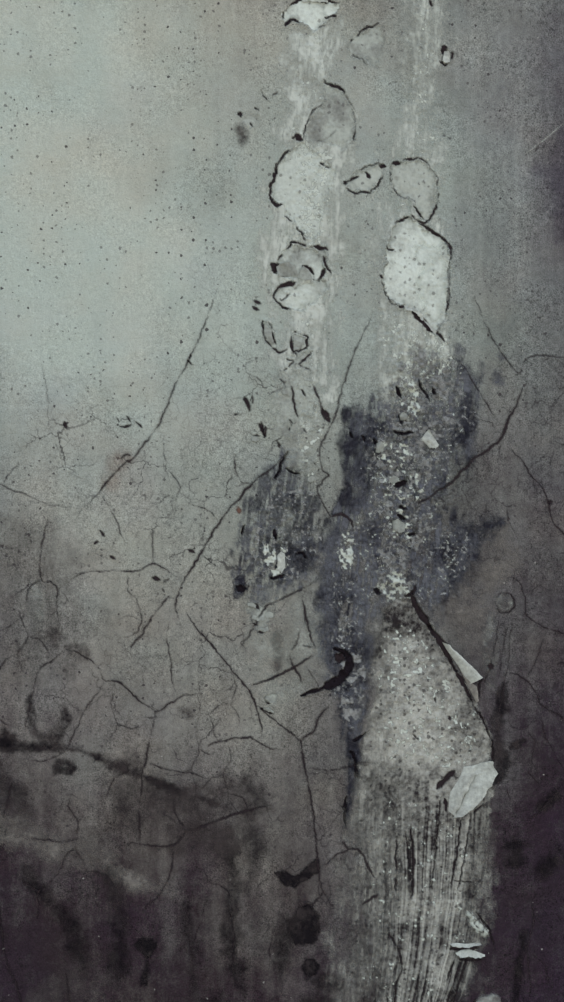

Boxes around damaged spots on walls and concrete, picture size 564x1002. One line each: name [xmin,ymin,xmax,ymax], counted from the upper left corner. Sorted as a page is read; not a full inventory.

peeling [281,0,339,31]
peeling [269,80,452,341]
peeling [241,321,322,579]
crack [418,327,564,534]
water stain [77,847,157,985]
water stain [0,695,266,887]
crack [0,319,378,907]
peeling [247,602,273,633]
water stain [274,858,320,888]
water stain [277,904,320,972]
peeling [330,348,501,1002]
water stain [492,684,526,784]